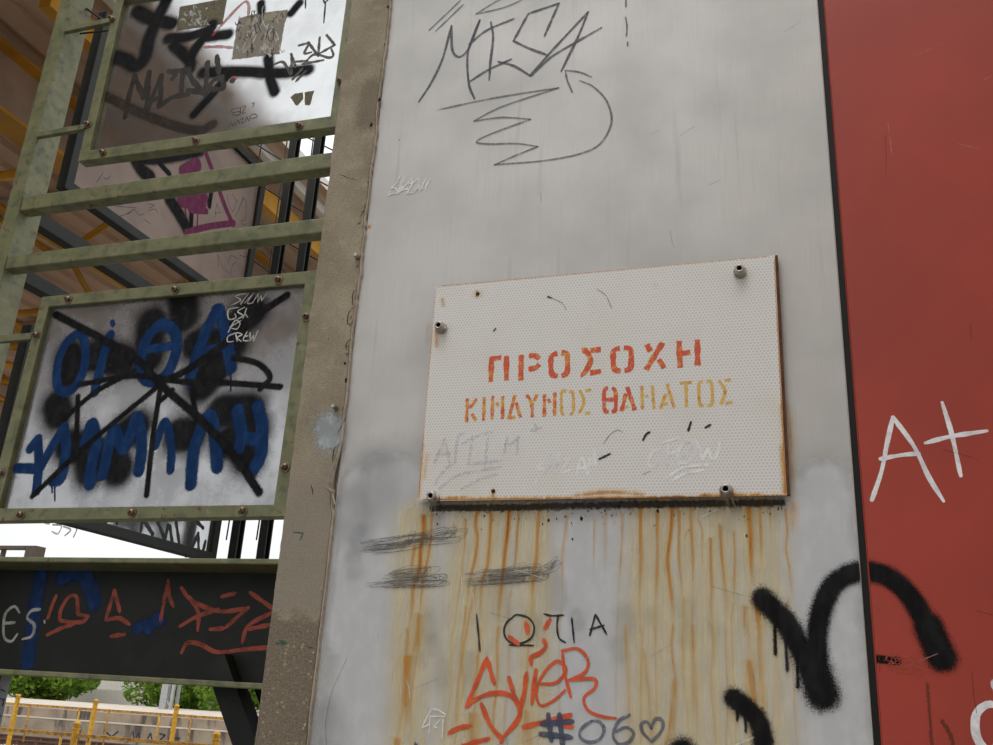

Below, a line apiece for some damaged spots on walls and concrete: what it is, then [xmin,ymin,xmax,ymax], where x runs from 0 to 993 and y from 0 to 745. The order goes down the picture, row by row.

rust [412,514,432,604]
rust [418,432,721,600]
rust [709,526,725,591]
rust [733,307,787,568]